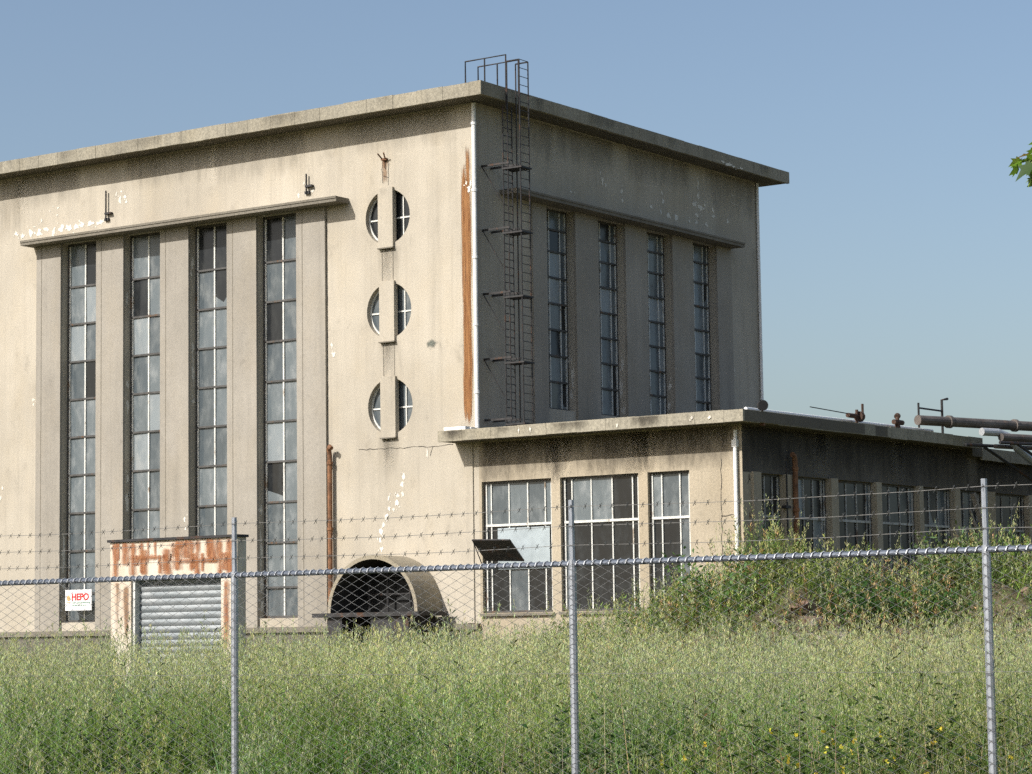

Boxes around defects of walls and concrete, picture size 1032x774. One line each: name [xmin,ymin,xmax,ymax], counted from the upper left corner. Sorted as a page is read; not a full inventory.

peeling [13,206,104,239]
rust [461,153,473,421]
peeling [377,472,405,552]
rust [112,539,232,646]